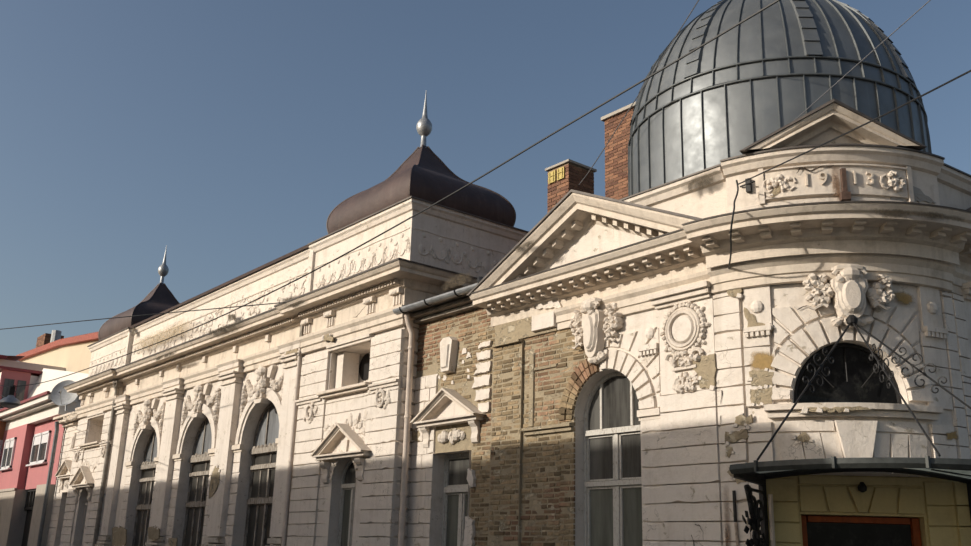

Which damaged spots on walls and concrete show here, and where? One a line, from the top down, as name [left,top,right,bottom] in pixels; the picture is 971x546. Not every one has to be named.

spalling [535,298,563,310]
spalling [416,308,599,546]
spalling [724,368,774,458]